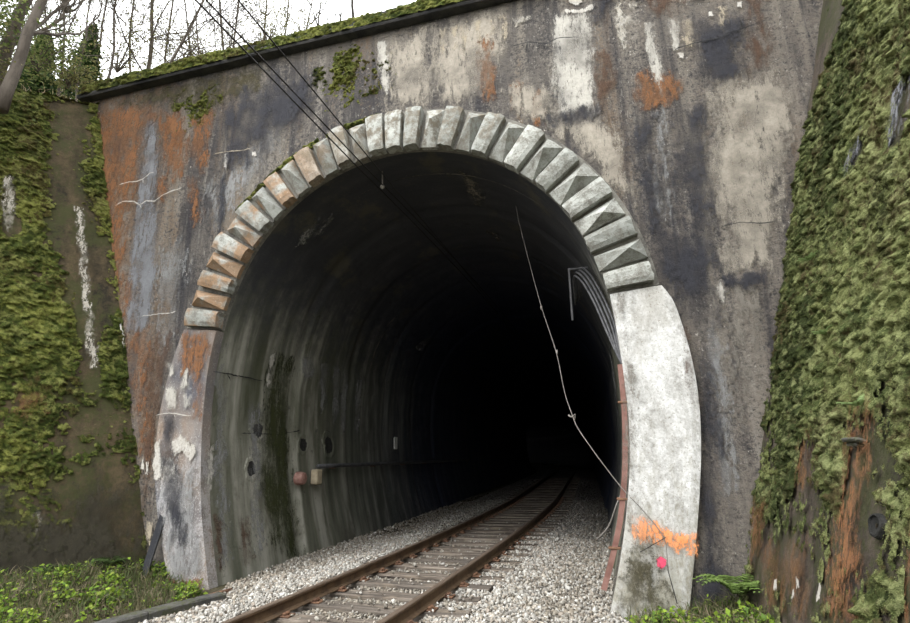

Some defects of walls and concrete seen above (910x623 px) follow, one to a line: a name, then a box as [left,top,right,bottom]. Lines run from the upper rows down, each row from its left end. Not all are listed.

crack [117,172,182,207]
rust [99,105,214,480]
damp [501,0,805,493]
rust [635,69,683,110]
damp [691,555,729,599]
rust [823,406,872,621]